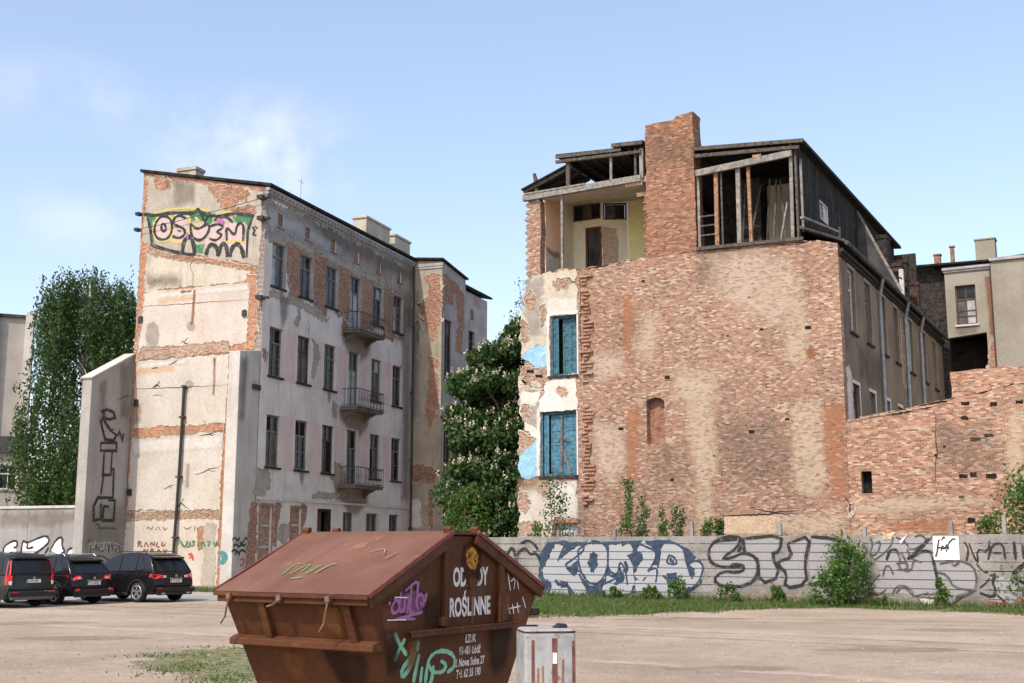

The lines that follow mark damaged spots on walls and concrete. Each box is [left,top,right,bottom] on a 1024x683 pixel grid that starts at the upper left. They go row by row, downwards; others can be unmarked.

spalling [143,175,173,210]
peeling [133,183,465,429]
spalling [519,289,548,344]
spalling [131,420,224,439]
spalling [517,365,579,456]
crack [931,416,943,490]
spalling [125,508,221,551]
spalling [243,461,348,570]
spalling [411,463,438,531]
spalling [517,483,550,537]